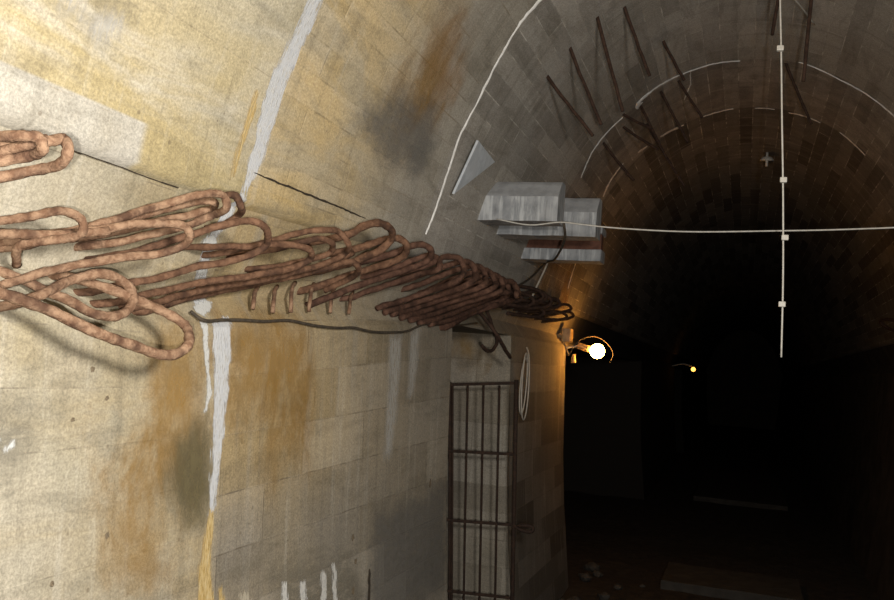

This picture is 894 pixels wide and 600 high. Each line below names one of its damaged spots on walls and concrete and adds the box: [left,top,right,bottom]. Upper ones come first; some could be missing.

leakage [194,0,323,288]
leakage [176,298,232,600]
leakage [320,564,337,600]